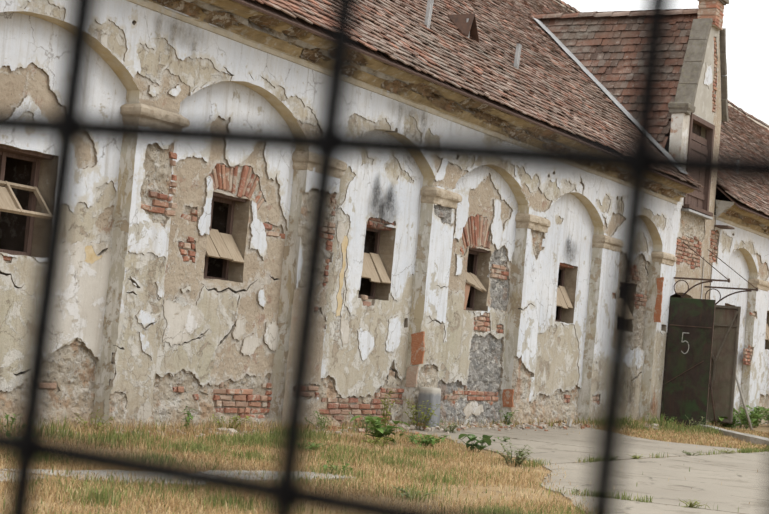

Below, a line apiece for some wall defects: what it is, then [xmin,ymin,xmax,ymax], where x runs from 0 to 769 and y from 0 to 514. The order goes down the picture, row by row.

spalling [0,134,54,155]
spalling [0,63,58,114]
peeling [20,0,65,21]
peeling [0,253,38,427]
peeling [43,181,116,429]
spalling [109,144,286,429]
peeling [309,160,580,428]
peeling [589,358,604,421]
peeling [626,243,667,422]
flaking render [675,209,769,285]